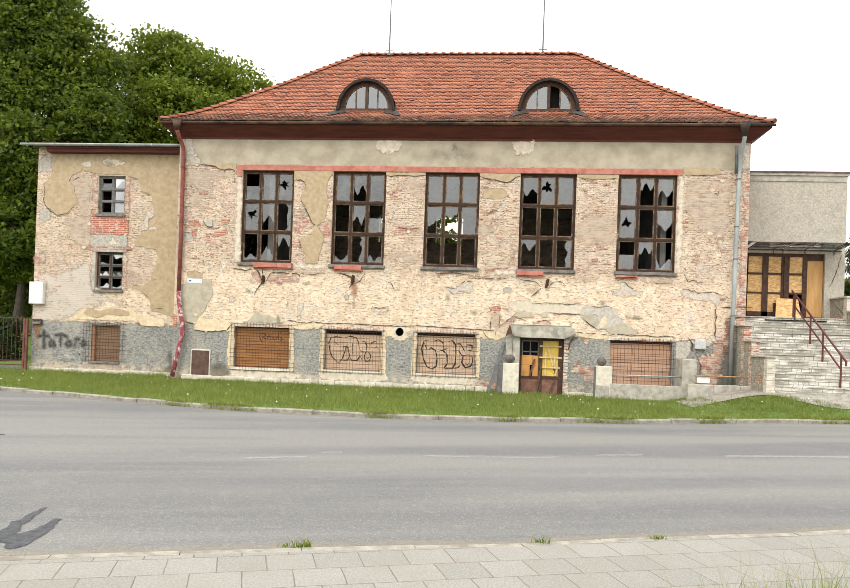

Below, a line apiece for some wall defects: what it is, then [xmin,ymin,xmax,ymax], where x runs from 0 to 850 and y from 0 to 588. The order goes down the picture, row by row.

flaking render [33,154,231,332]
crack [230,260,319,294]
flaking render [394,225,422,236]
spalling [437,245,518,294]
crack [279,272,702,371]
flaking render [577,214,617,246]
flaking render [578,305,731,385]
crack [682,273,752,338]